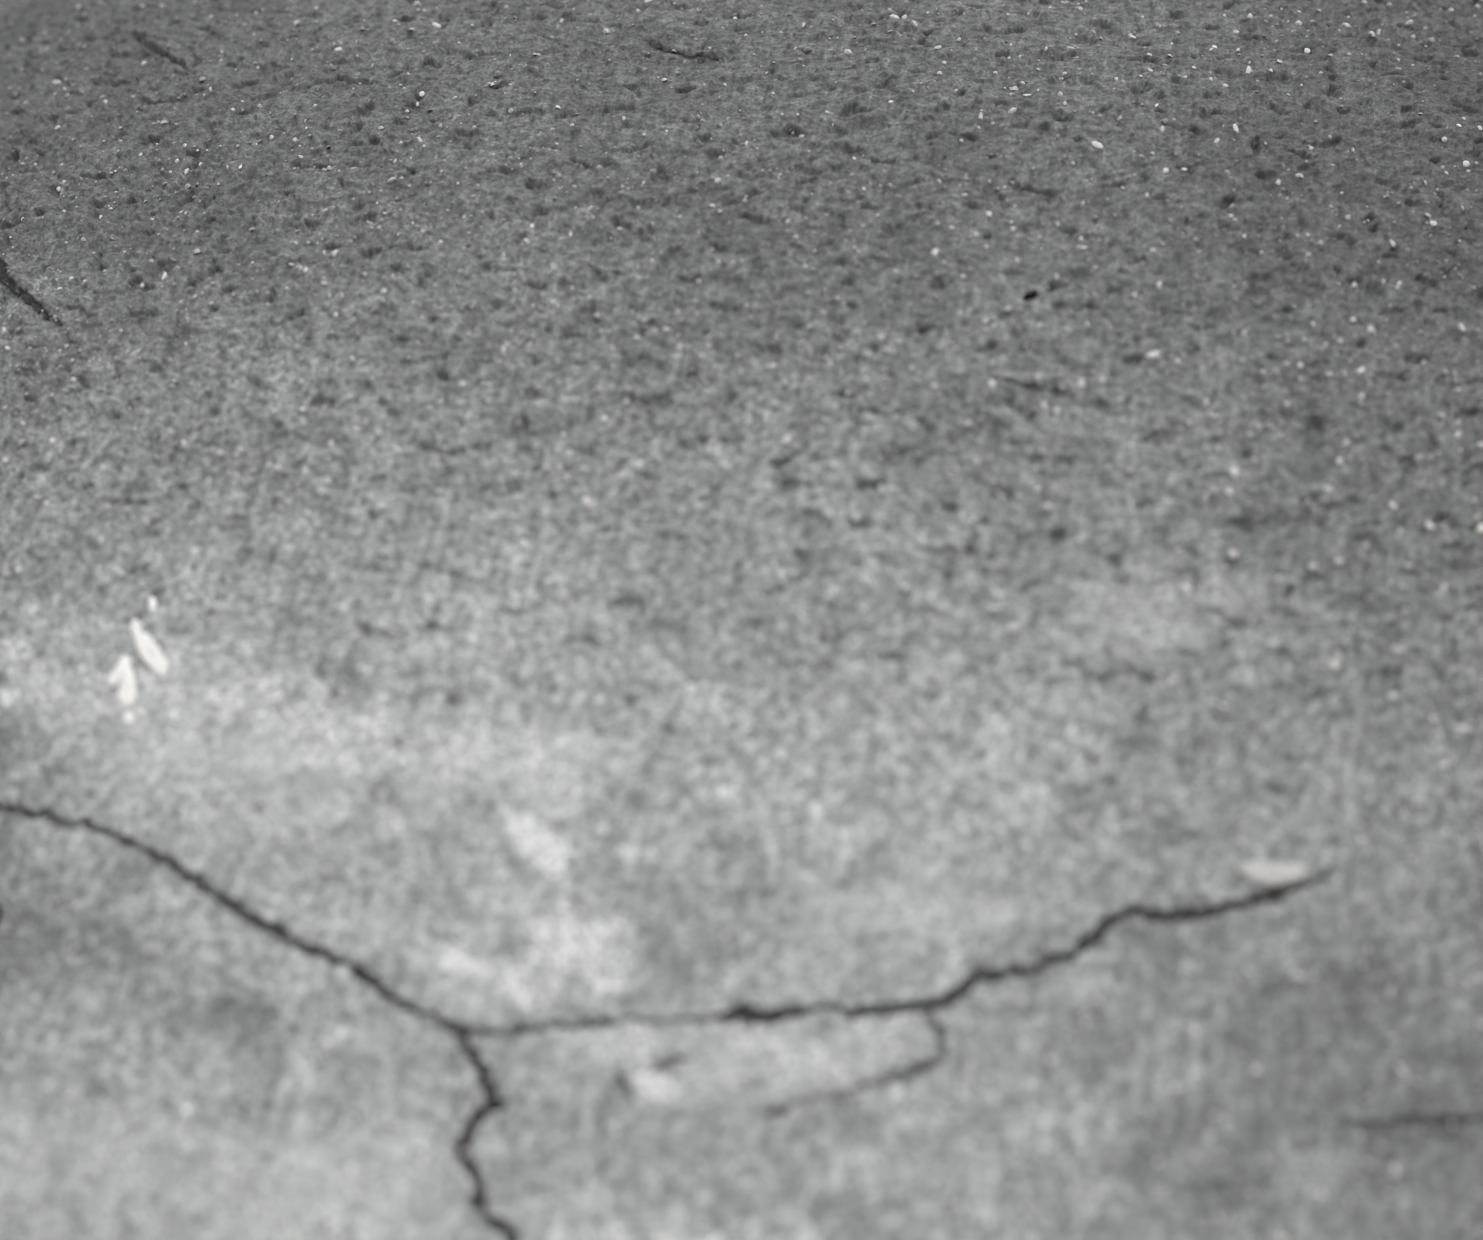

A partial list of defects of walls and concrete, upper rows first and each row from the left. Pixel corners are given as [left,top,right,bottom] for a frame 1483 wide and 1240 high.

crack [0,803,1332,1240]